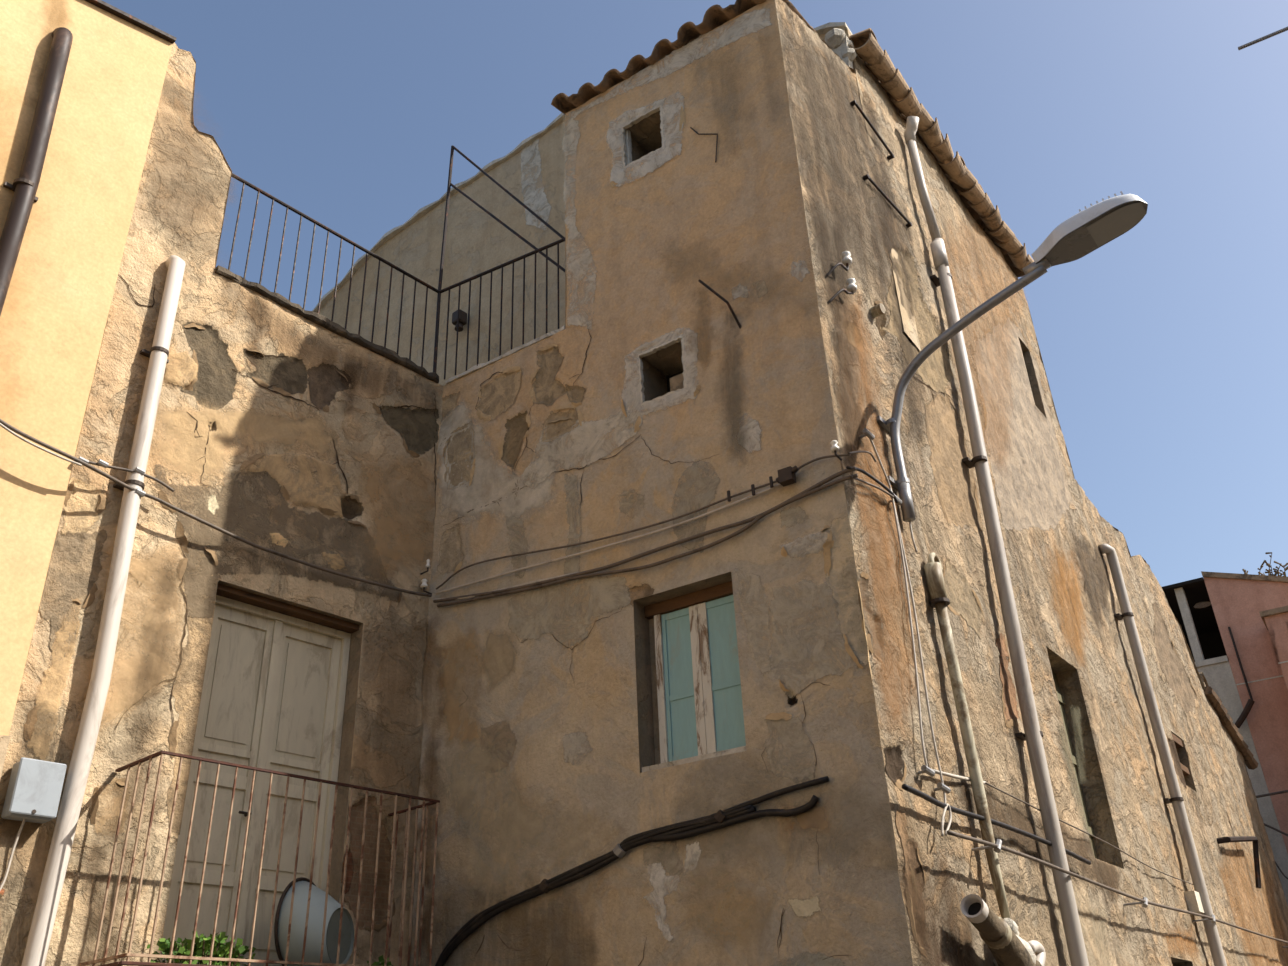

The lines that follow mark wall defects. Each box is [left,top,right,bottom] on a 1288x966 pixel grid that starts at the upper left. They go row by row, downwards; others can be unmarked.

peeling [373,344,585,517]
crack [114,548,188,736]
peeling [153,322,402,835]
crack [794,682,825,778]